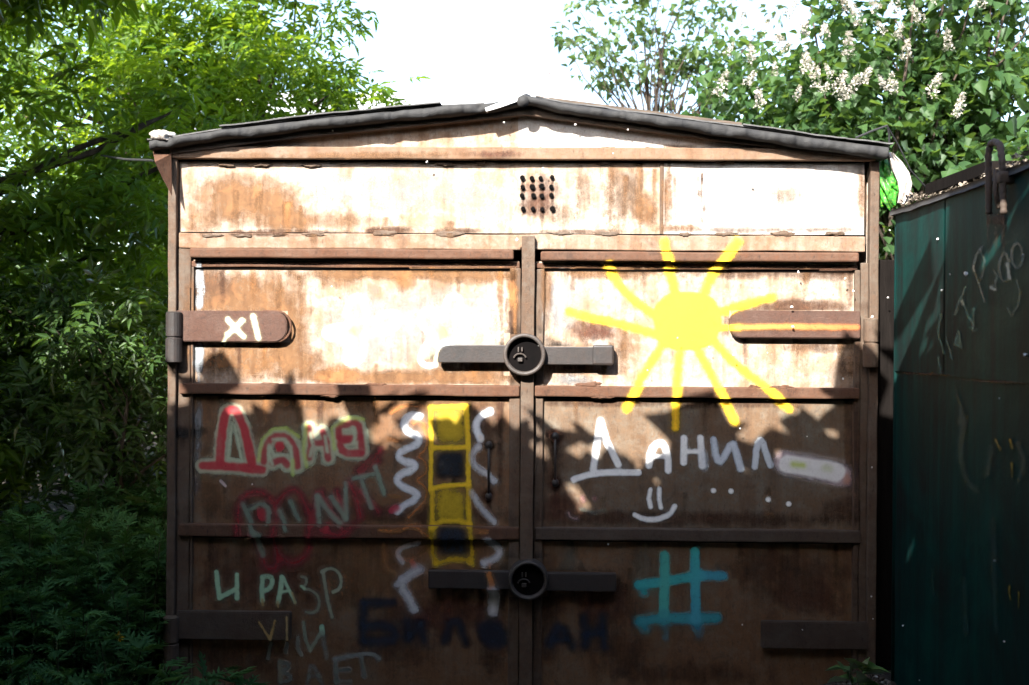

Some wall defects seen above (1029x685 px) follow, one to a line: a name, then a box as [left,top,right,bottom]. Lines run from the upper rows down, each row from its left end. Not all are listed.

corrosion [191,173,354,236]
corrosion [366,218,408,234]
corrosion [608,163,699,231]